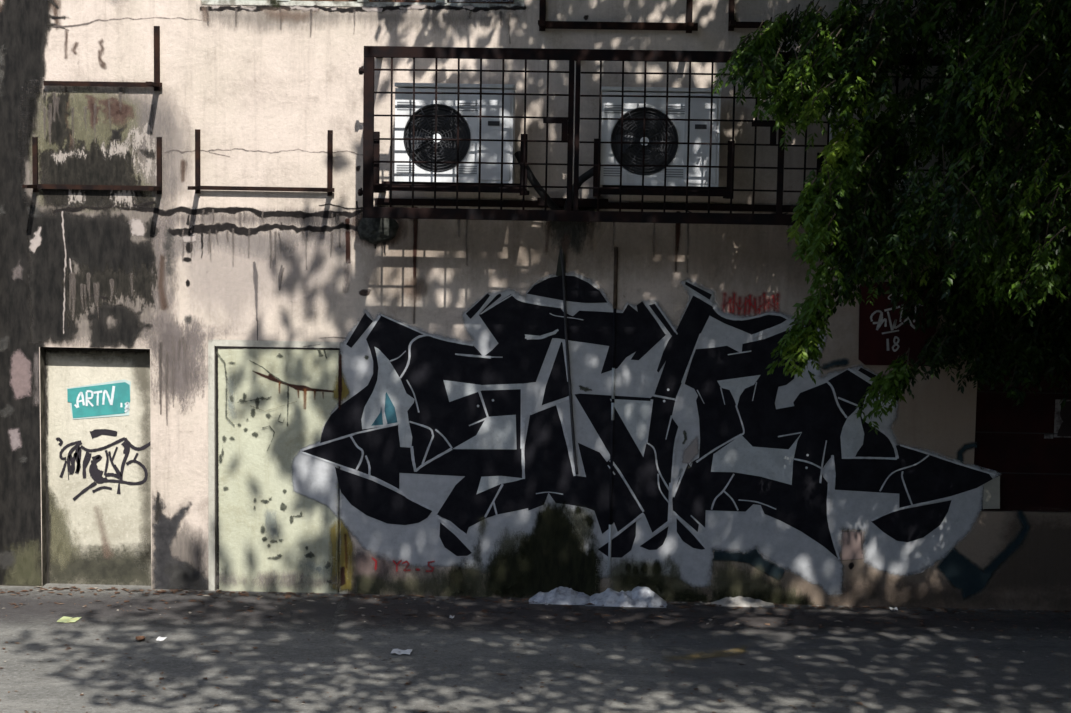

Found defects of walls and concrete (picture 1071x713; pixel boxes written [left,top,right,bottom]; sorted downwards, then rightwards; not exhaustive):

leakage [0,0,363,590]
corrosion [251,355,349,423]